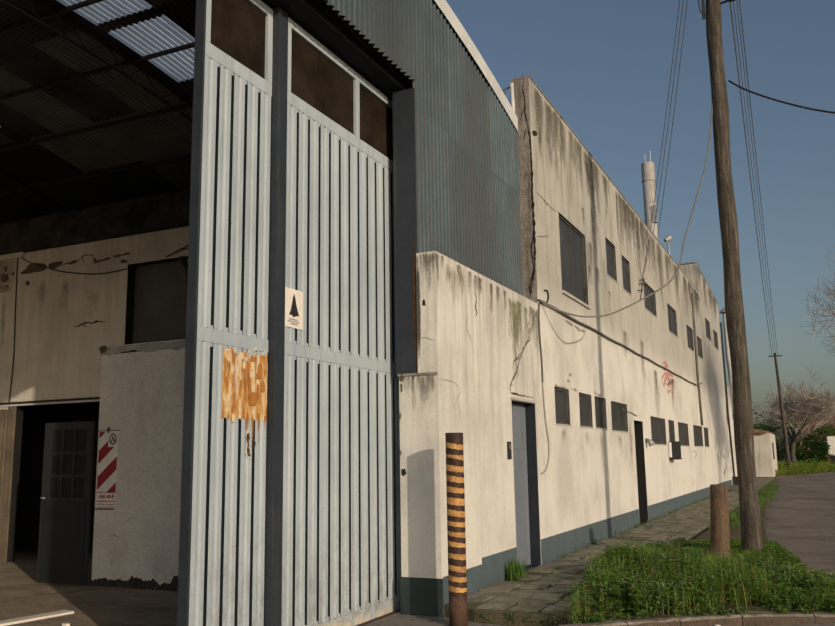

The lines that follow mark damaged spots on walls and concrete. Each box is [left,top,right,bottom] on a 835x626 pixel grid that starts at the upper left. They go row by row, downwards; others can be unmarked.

crack [510,80,557,398]
water stain [535,91,717,308]
crack [74,319,106,327]
water stain [416,254,443,349]
water stain [469,272,538,343]
spalling [90,576,178,591]